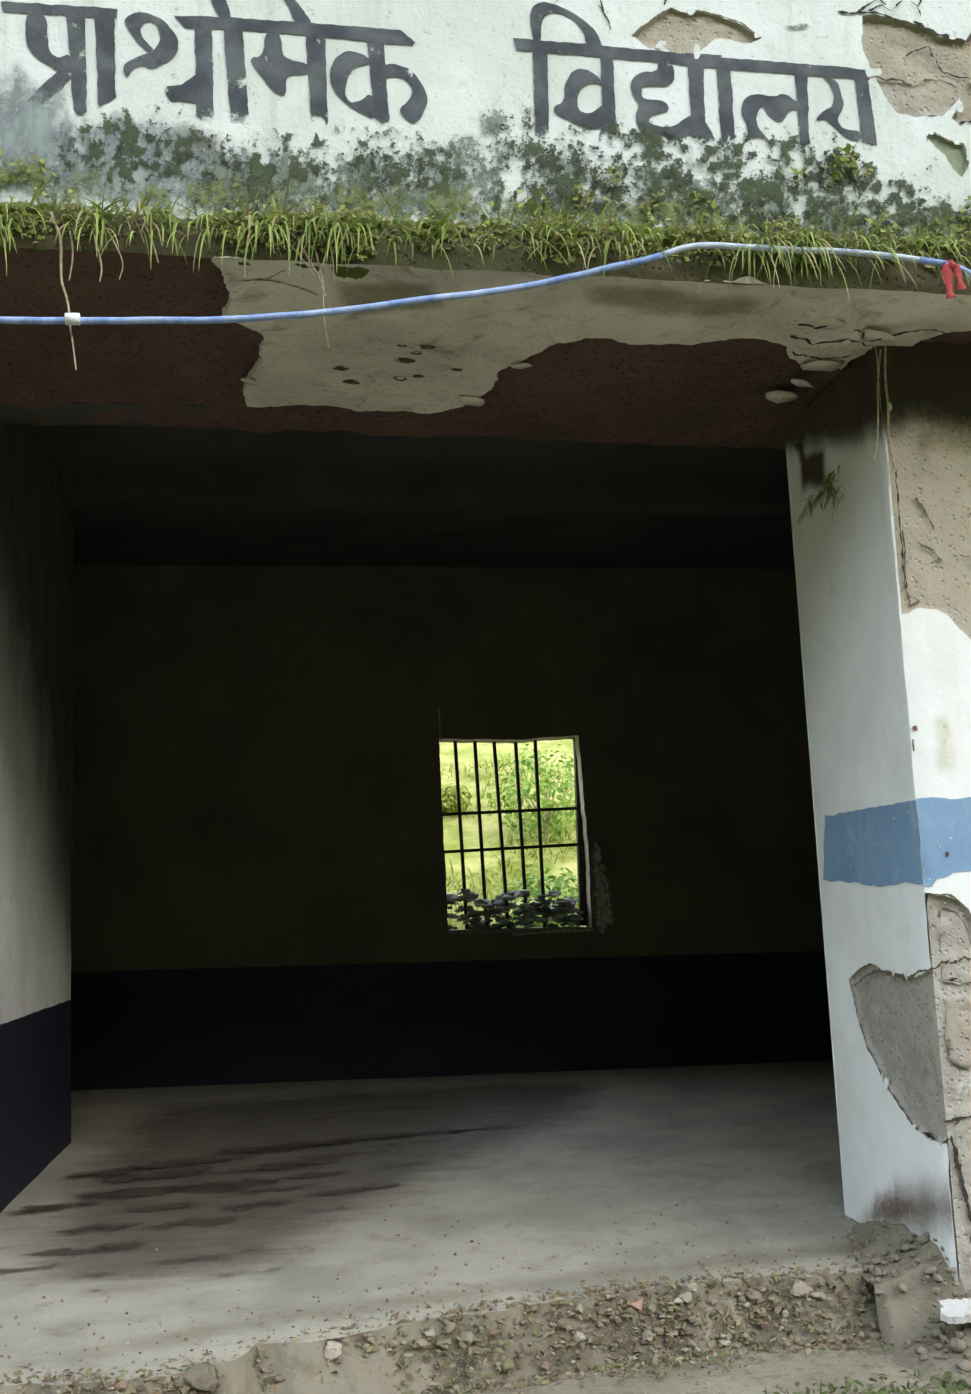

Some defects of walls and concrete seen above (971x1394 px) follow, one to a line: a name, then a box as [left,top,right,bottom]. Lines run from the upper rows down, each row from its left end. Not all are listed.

leakage [481,109,507,190]
peeling [631,8,762,59]
leakage [818,135,864,186]
peeling [861,14,971,177]
spalling [0,248,971,449]
peeling [885,414,971,639]
flaking render [849,893,971,1293]
crack [944,1115,971,1244]